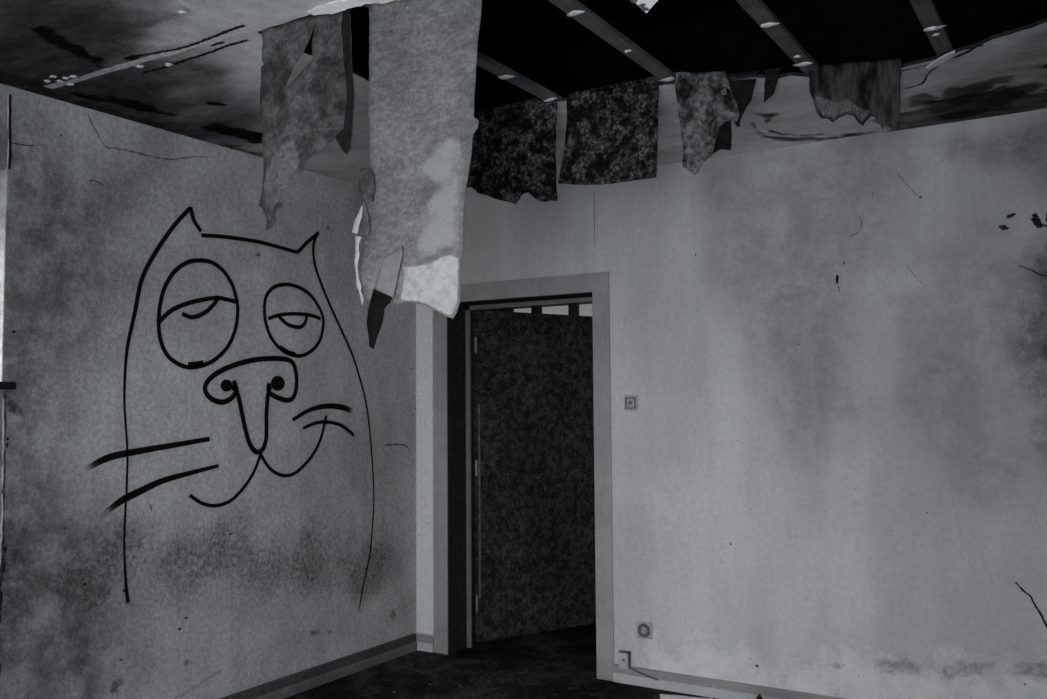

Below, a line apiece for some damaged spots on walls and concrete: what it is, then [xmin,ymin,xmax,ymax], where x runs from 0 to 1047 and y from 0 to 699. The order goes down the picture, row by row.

flaking render [306,0,394,15]
damp [31,26,105,67]
spalling [926,50,955,69]
damp [72,92,176,116]
damp [204,124,263,144]
crack [1015,582,1047,628]